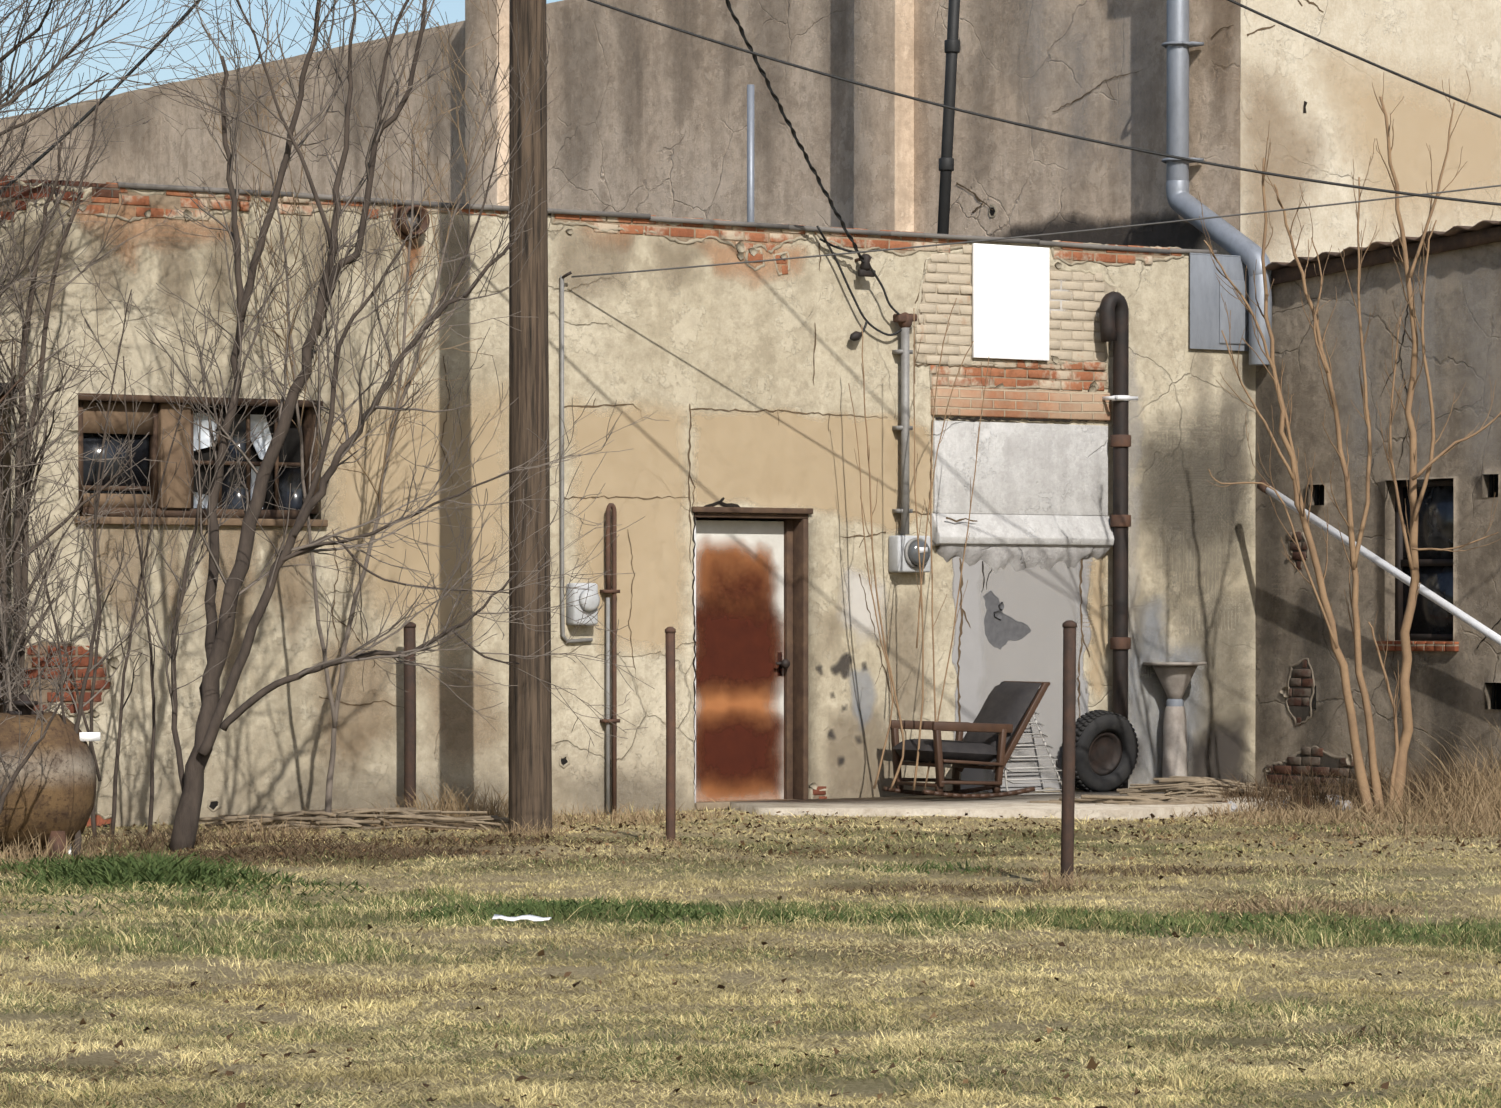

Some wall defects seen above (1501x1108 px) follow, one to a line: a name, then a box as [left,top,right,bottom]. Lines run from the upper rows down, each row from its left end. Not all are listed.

crack [1052,69,1143,112]
flaking render [0,176,509,227]
flaking render [551,214,1184,392]
spalling [983,590,1031,650]
flaking render [24,638,119,717]
corrosion [696,544,781,802]
flaking render [1280,658,1315,727]